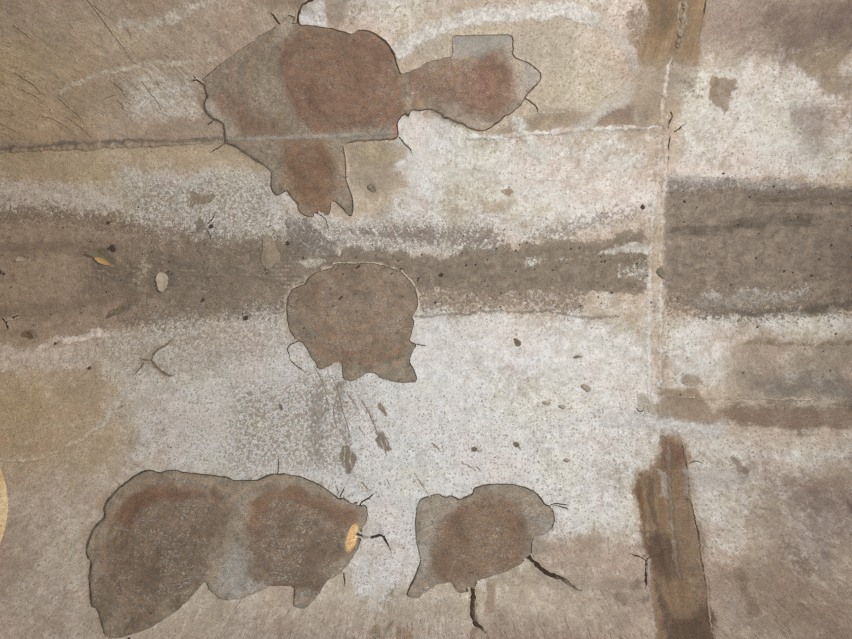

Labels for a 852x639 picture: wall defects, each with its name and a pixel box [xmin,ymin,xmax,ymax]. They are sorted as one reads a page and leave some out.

crack [679,0,709,43]
peeling [202,15,542,217]
crack [664,111,684,164]
leakage [667,172,820,191]
peeling [286,263,418,383]
leakage [690,282,815,319]
peeling [85,470,368,639]
peeling [406,483,555,598]
crack [630,552,662,589]
crack [678,445,716,639]